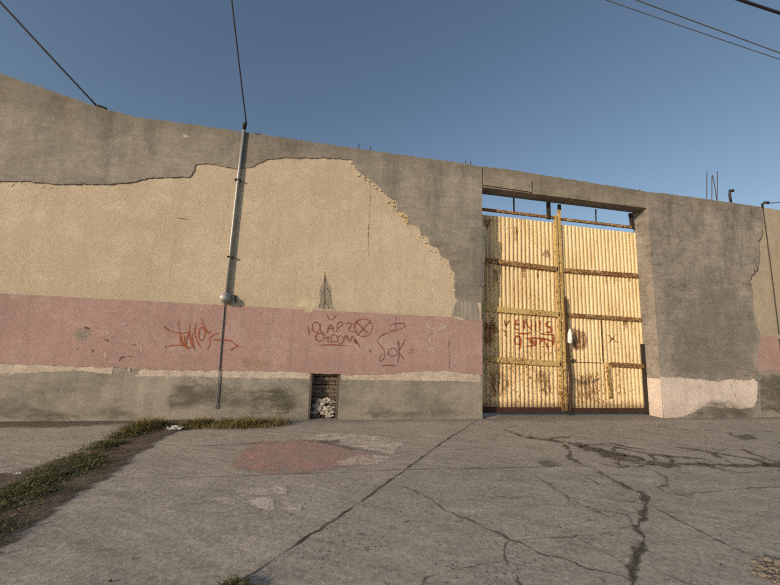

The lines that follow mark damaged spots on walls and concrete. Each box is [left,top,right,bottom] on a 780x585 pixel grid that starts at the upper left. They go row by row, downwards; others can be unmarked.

flaking render [297,277,335,313]
corrosion [483,314,497,344]
corrosion [572,329,587,350]
damp [172,385,295,407]
corrosion [576,373,612,406]
crack [399,425,780,585]